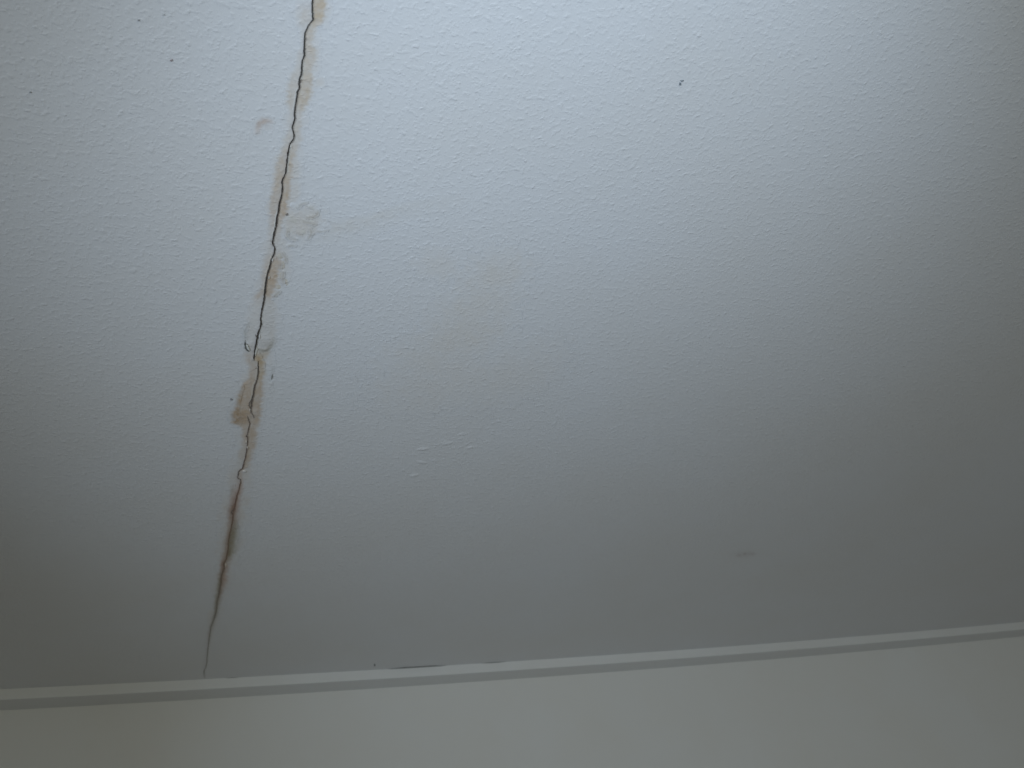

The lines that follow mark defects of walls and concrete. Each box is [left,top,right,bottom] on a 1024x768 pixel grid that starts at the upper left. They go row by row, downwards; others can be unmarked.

crack [203,0,314,678]
damp [204,0,334,667]